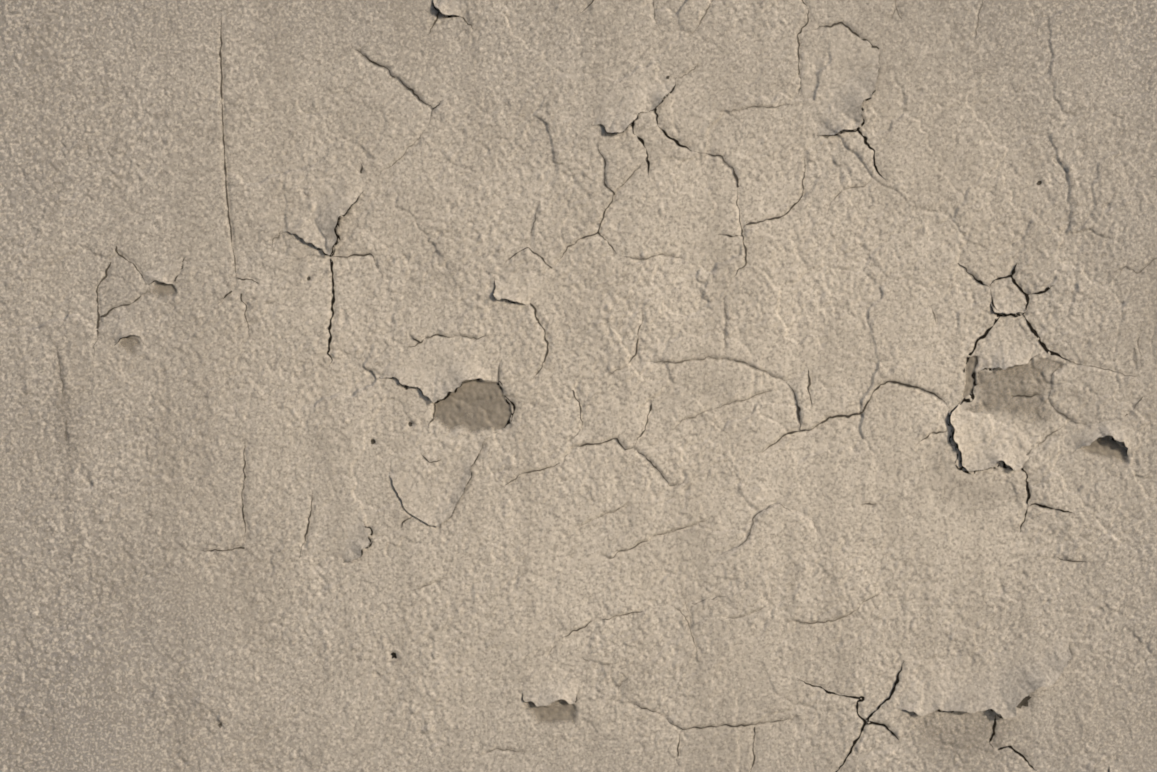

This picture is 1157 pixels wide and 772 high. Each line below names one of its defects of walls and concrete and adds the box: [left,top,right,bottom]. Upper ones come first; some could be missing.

crack [218,16,258,336]
peeling [593,65,699,175]
peeling [379,339,516,527]
crack [503,145,948,487]
peeling [947,279,1061,509]
crack [957,263,1143,430]
peeling [1075,414,1136,460]
peeling [522,665,579,722]
crack [546,611,805,772]
crack [797,663,903,772]
peeling [896,637,1072,719]
crack [989,715,1035,770]